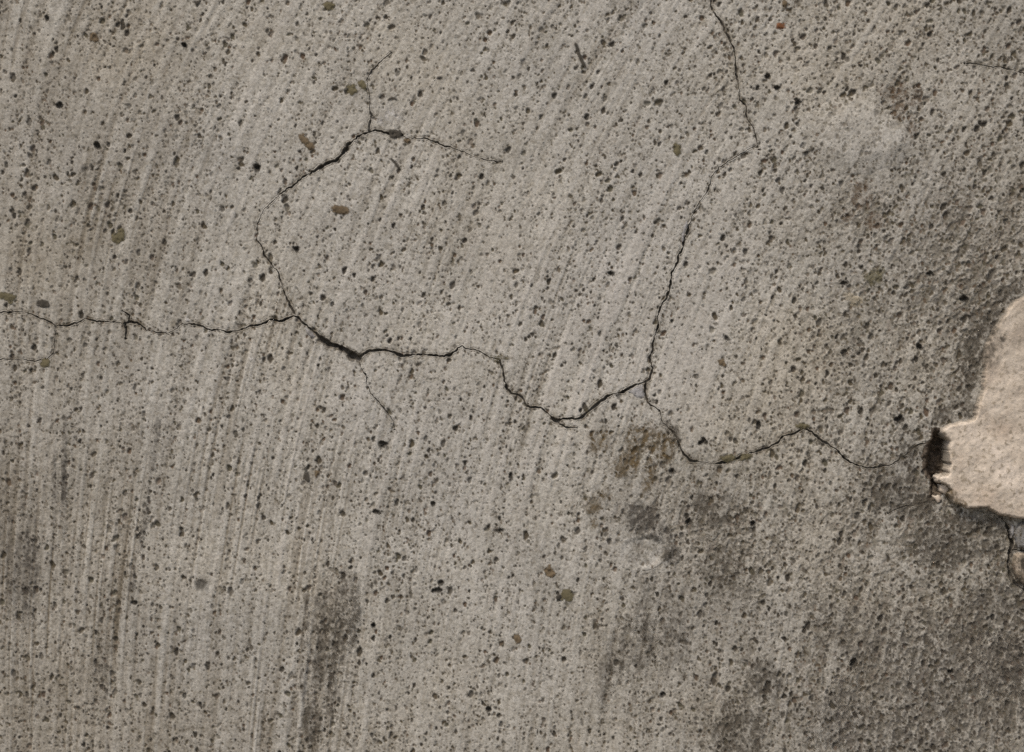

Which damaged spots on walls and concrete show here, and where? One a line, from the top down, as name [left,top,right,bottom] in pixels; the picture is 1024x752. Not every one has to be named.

crack [0,0,927,470]
peeling [931,473,949,503]